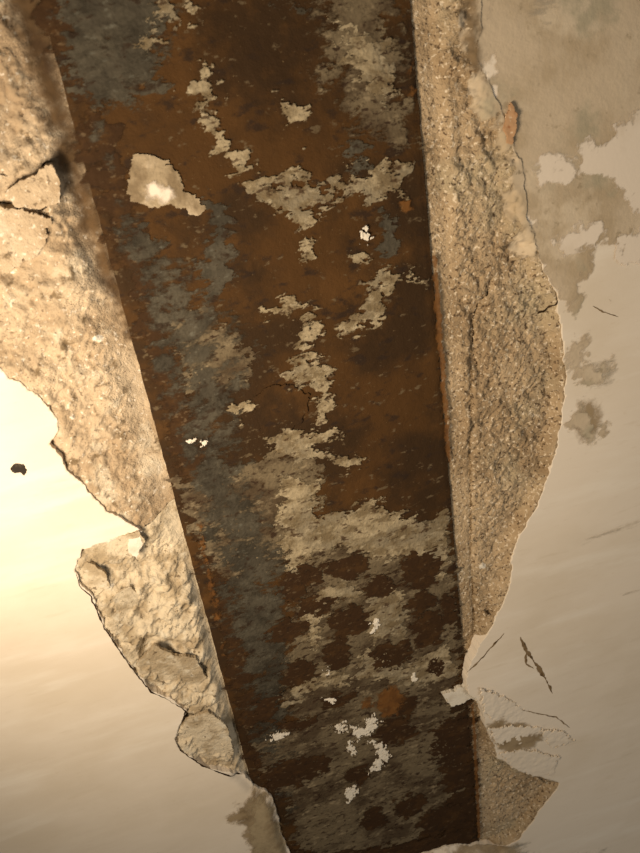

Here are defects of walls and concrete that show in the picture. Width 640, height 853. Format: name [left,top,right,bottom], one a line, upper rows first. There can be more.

peeling [42,0,200,133]
peeling [186,60,258,178]
crack [0,161,52,204]
peeling [237,140,415,233]
peeling [334,264,402,339]
peeling [279,306,337,426]
peeling [10,463,27,475]
rust [9,0,482,853]
water stain [580,403,600,434]
crack [470,634,553,694]
spalling [453,688,575,853]
water stain [487,721,542,752]